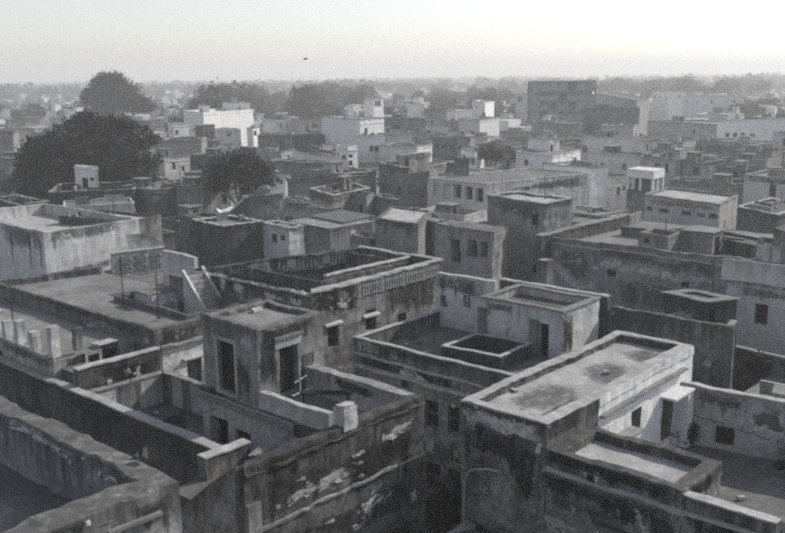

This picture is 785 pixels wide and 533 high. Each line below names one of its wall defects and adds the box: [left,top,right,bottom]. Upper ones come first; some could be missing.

leakage [5,225,42,265]
leakage [335,378,372,397]
leakage [516,385,576,414]
leakage [586,363,626,383]
peeling [382,418,413,442]
peeling [451,404,551,455]
peeling [734,402,785,439]
peeling [9,420,117,484]
peeling [275,449,365,510]
leakage [256,403,413,533]
leakage [423,430,673,533]
peeling [353,490,393,531]